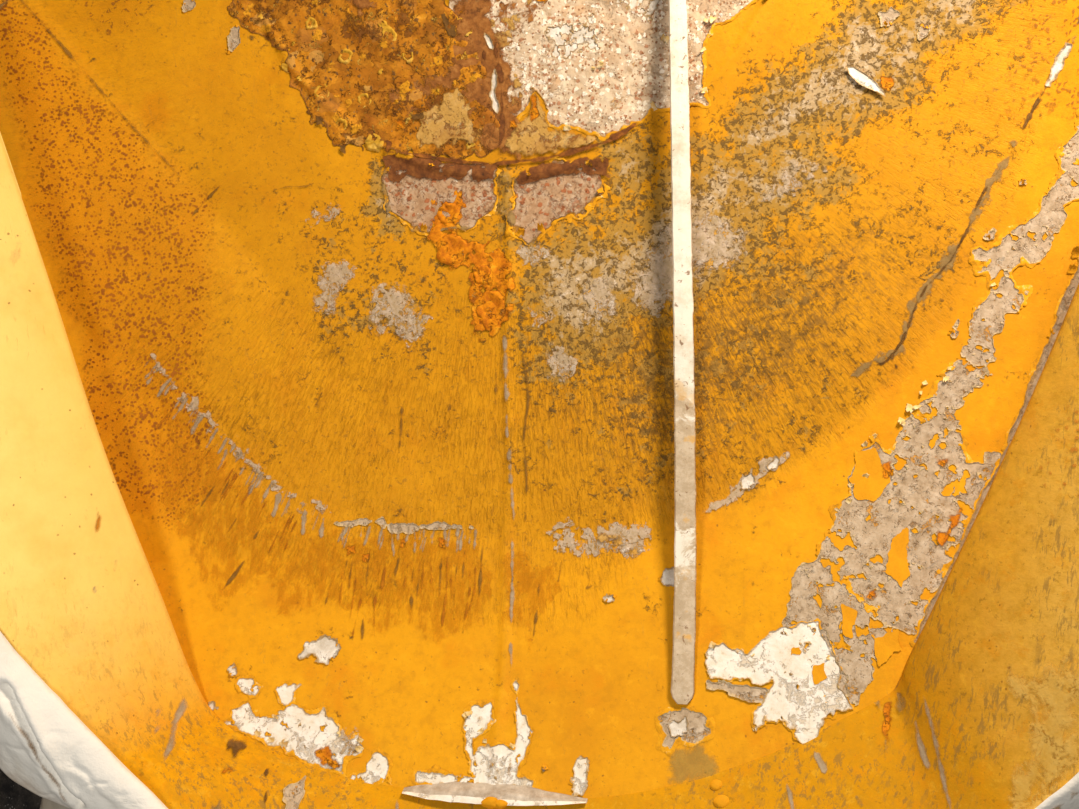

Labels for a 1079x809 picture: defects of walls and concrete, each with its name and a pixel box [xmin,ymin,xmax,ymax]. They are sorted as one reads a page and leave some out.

rust [389,0,596,160]
peeling [485,0,670,141]
peeling [687,0,758,108]
rust [427,188,516,341]
peeling [381,139,610,267]
crack [851,20,1079,377]
peeling [145,353,477,562]
peeling [704,106,1079,744]
peeling [546,517,652,558]
peeling [208,663,393,786]
peeling [407,677,549,788]
peeling [568,755,590,797]